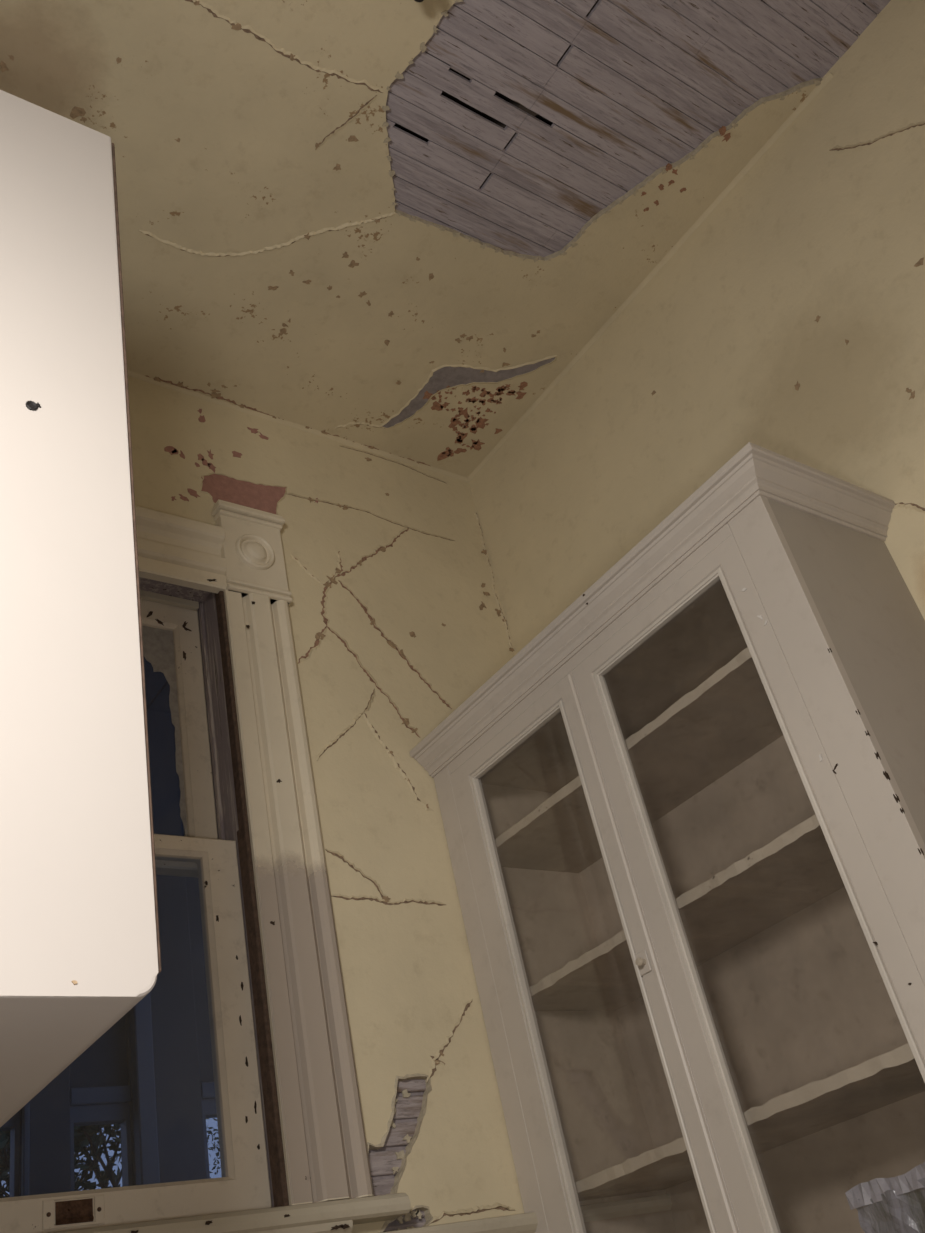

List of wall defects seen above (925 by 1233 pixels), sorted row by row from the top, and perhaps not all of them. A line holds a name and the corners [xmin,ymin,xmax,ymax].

peeling [70,106,87,123]
crack [185,0,384,149]
spalling [382,0,891,263]
crack [829,121,925,151]
peeling [335,348,558,461]
peeling [164,446,287,515]
crack [893,502,925,513]
crack [288,493,514,812]
crack [325,849,446,906]
crack [427,999,473,1082]
spalling [367,1073,432,1196]